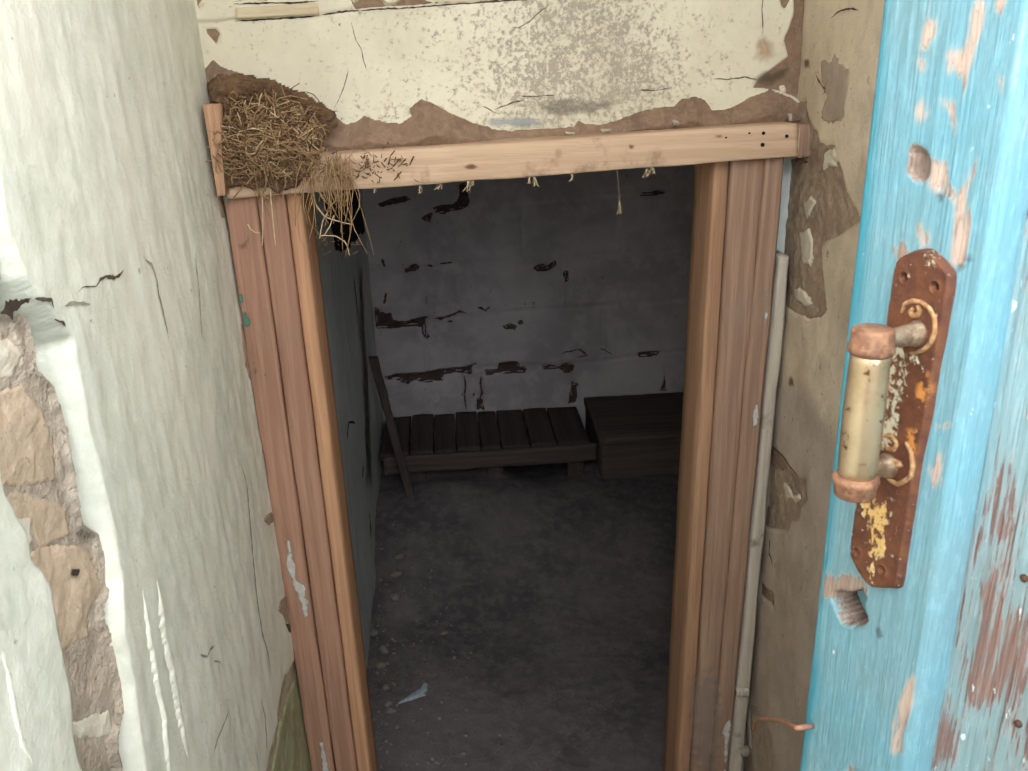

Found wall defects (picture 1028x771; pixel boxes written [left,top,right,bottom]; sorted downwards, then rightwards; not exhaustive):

peeling [351,0,447,9]
peeling [206,29,220,43]
peeling [753,0,860,319]
peeling [422,182,470,222]
crack [0,271,123,327]
crack [145,259,169,339]
peeling [374,307,430,339]
peeling [384,361,527,384]
peeling [542,363,578,404]
peeling [766,448,808,531]
flaking render [0,312,124,771]
peeling [278,597,291,633]